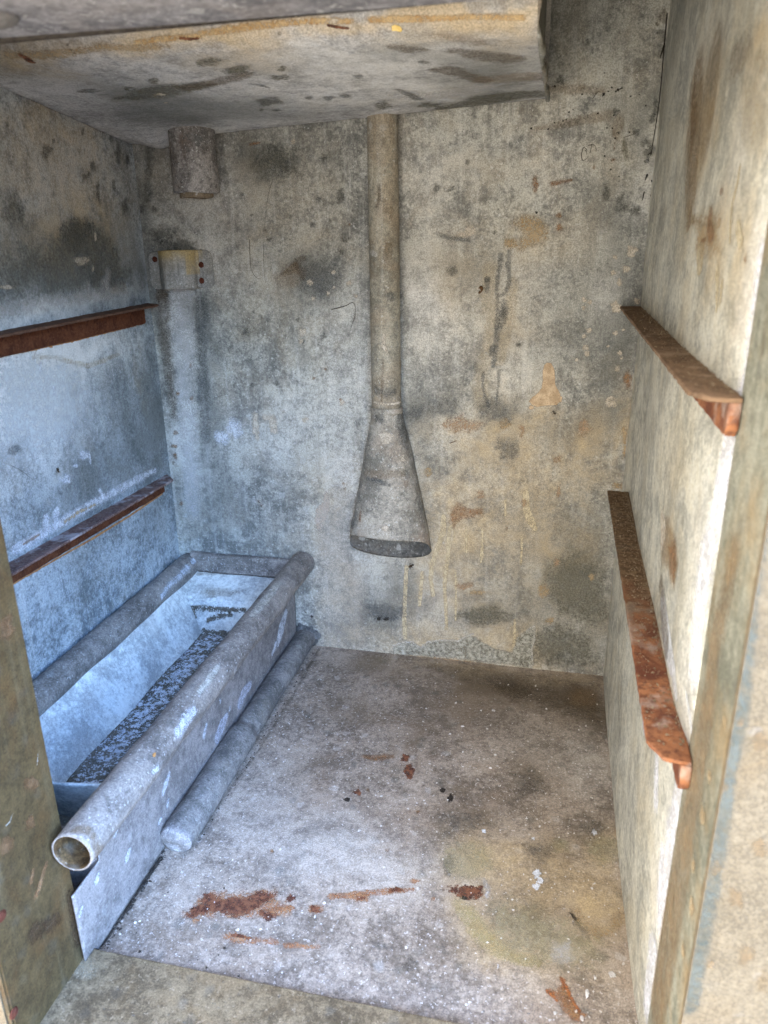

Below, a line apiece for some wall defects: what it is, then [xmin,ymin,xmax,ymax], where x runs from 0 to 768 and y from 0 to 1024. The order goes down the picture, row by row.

water stain [114,59,286,111]
water stain [378,408,422,462]
water stain [368,506,608,675]
rust [362,754,415,780]
rust [184,889,296,922]
rust [308,878,420,913]
rust [431,884,485,901]
rust [223,933,317,949]
rust [546,977,585,1021]